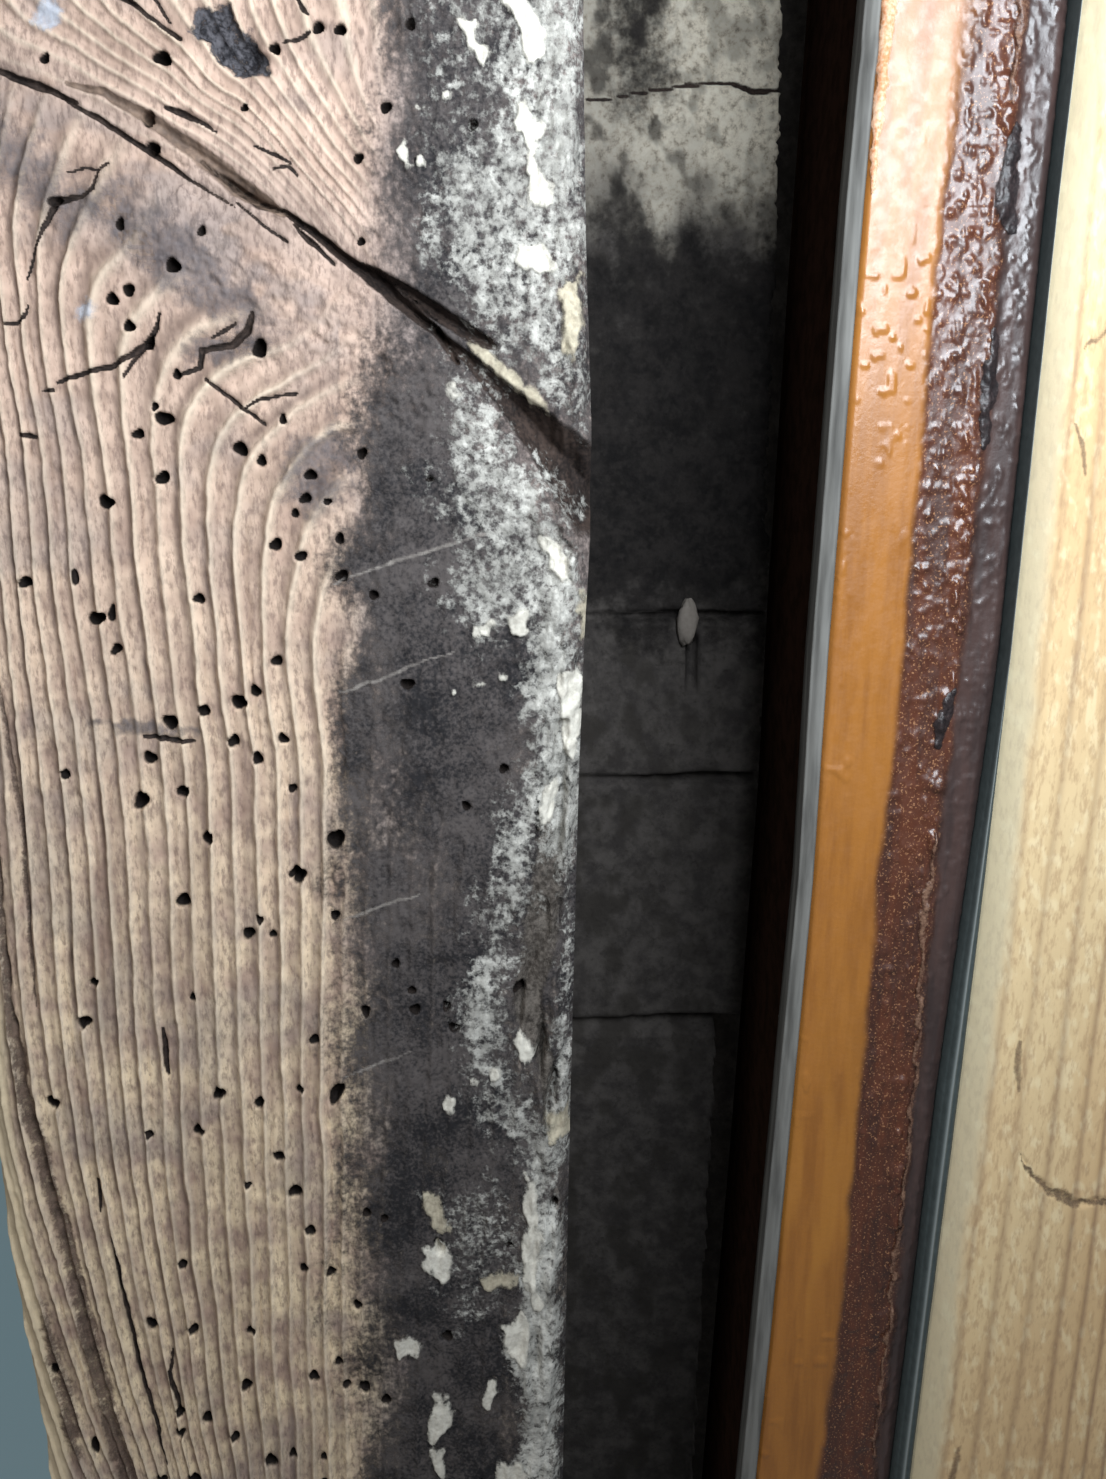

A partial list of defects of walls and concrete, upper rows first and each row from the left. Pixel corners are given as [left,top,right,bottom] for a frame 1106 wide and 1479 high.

crack [0,68,591,534]
damp [284,433,343,507]
crack [586,82,778,101]
spalling [394,0,590,1479]